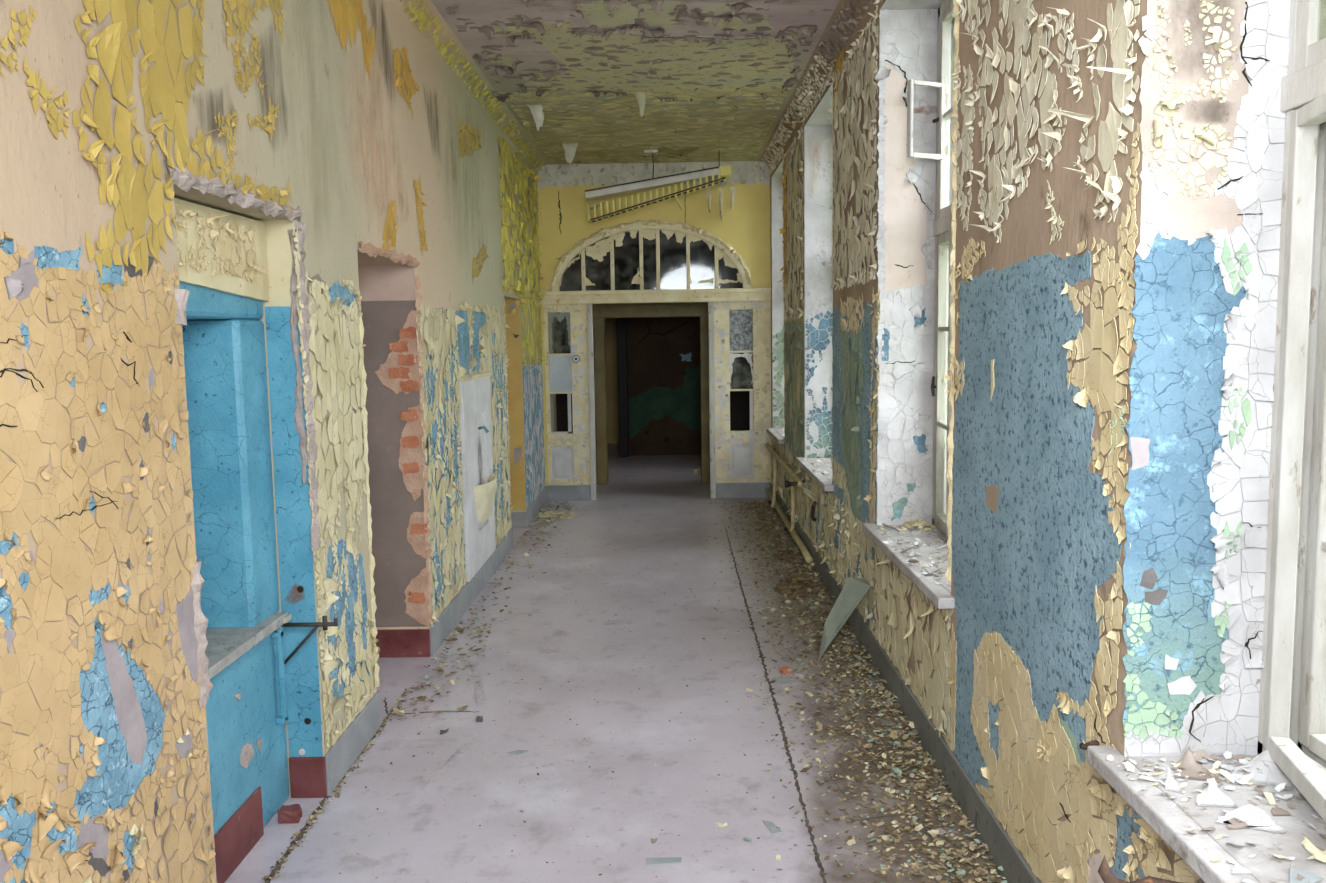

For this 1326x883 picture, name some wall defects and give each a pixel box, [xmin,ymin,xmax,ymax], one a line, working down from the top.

peeling [0,0,380,754]
peeling [359,0,1252,790]
crack [0,245,216,883]
peeling [0,583,193,883]
peeling [240,739,263,769]
crack [264,697,479,883]
peeling [1056,792,1160,883]
peeling [1165,746,1295,833]
peeling [1301,834,1326,855]